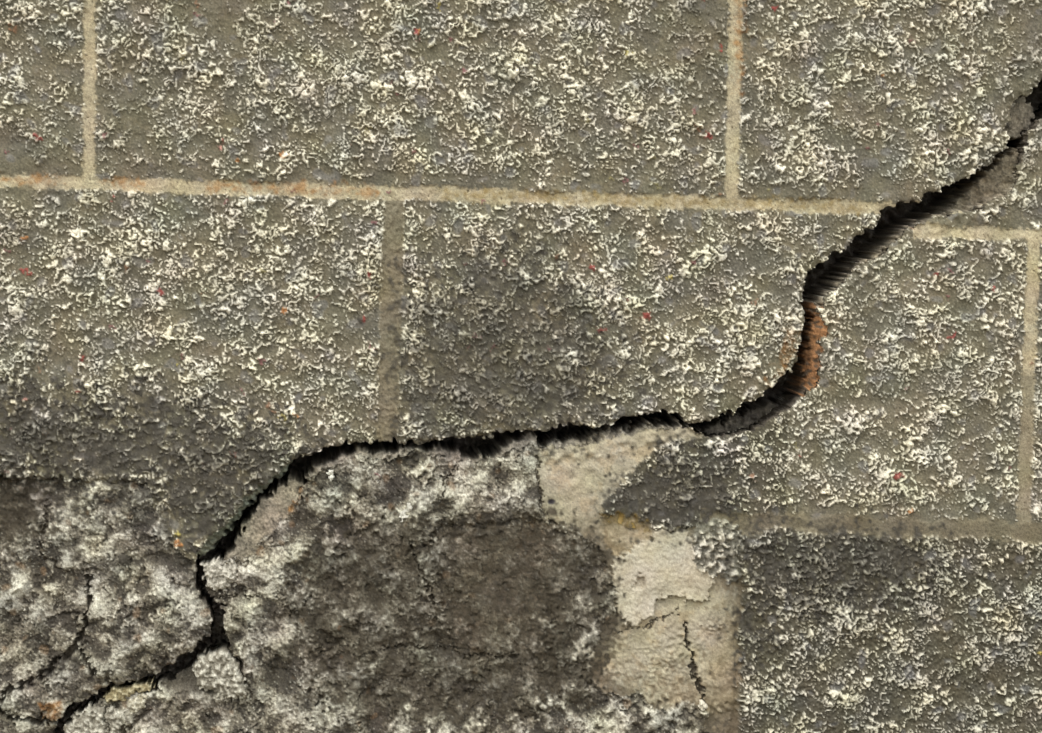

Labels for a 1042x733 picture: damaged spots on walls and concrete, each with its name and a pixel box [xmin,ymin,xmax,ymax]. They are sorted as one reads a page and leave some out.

crack [126,78,1042,701]
crack [36,495,65,571]
crack [0,574,113,733]
crack [118,709,152,733]
spalling [0,427,746,733]